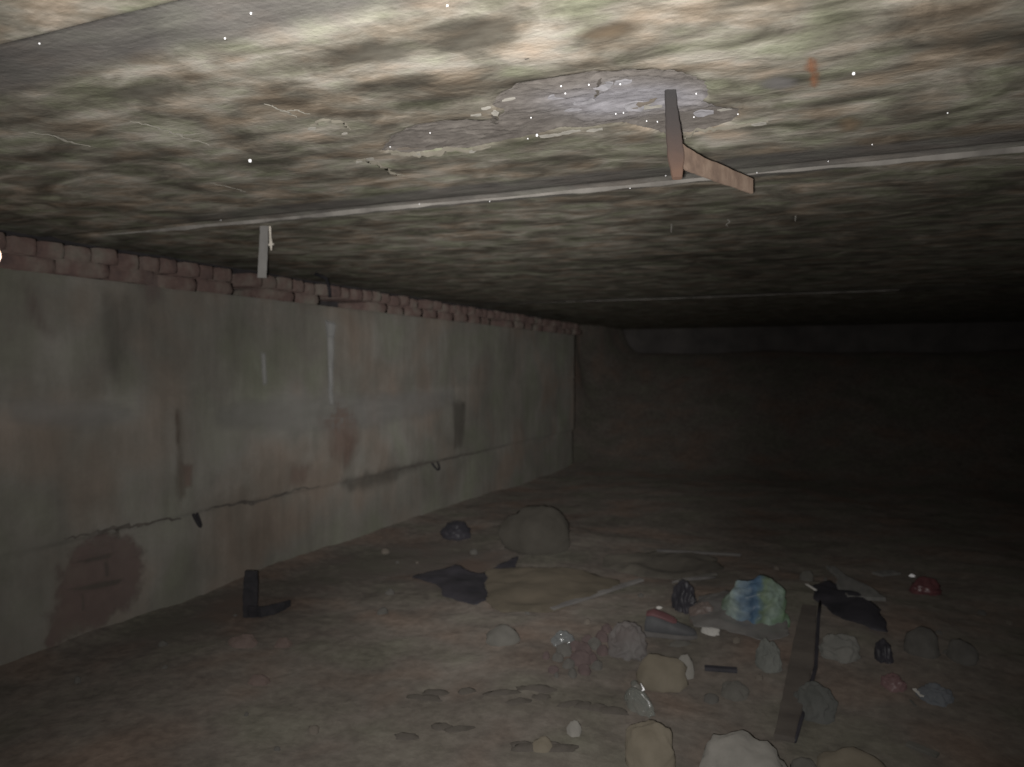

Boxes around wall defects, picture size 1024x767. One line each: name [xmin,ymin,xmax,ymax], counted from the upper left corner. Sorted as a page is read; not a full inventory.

spalling [354,69,768,176]
crack [64,486,320,540]